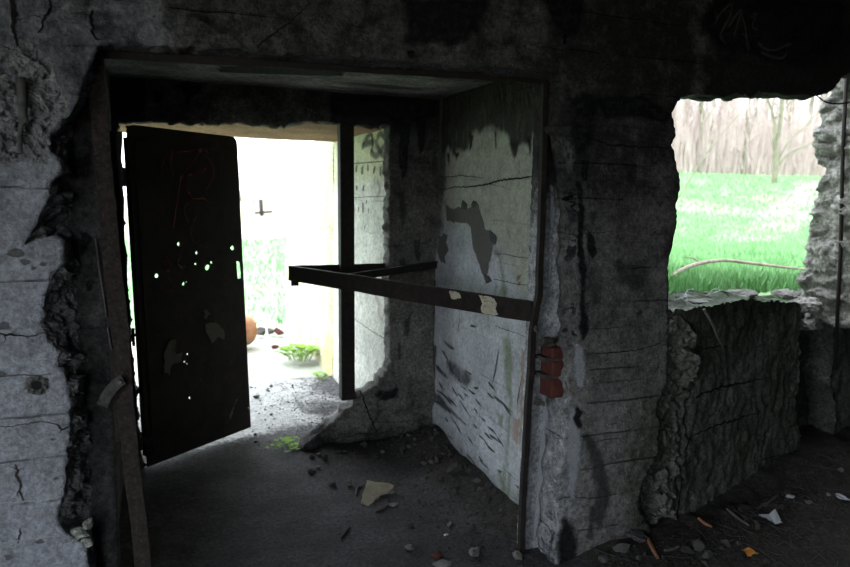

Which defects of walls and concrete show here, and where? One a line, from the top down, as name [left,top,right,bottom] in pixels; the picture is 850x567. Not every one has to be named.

crack [438,174,532,190]
crack [0,332,47,343]
spalling [0,42,99,567]
peeling [437,233,448,264]
peeling [446,200,498,316]
crack [0,421,69,433]
flaking render [534,337,570,565]
spalling [639,309,702,524]